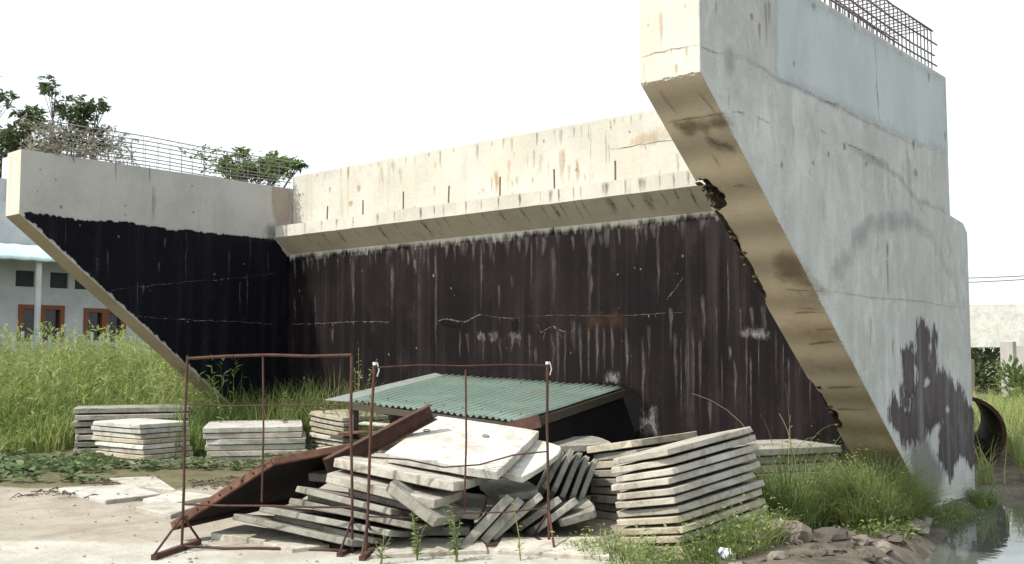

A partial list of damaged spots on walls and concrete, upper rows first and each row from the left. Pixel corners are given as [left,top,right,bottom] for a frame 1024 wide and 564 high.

spalling [695,179,767,304]
water stain [572,375,656,437]